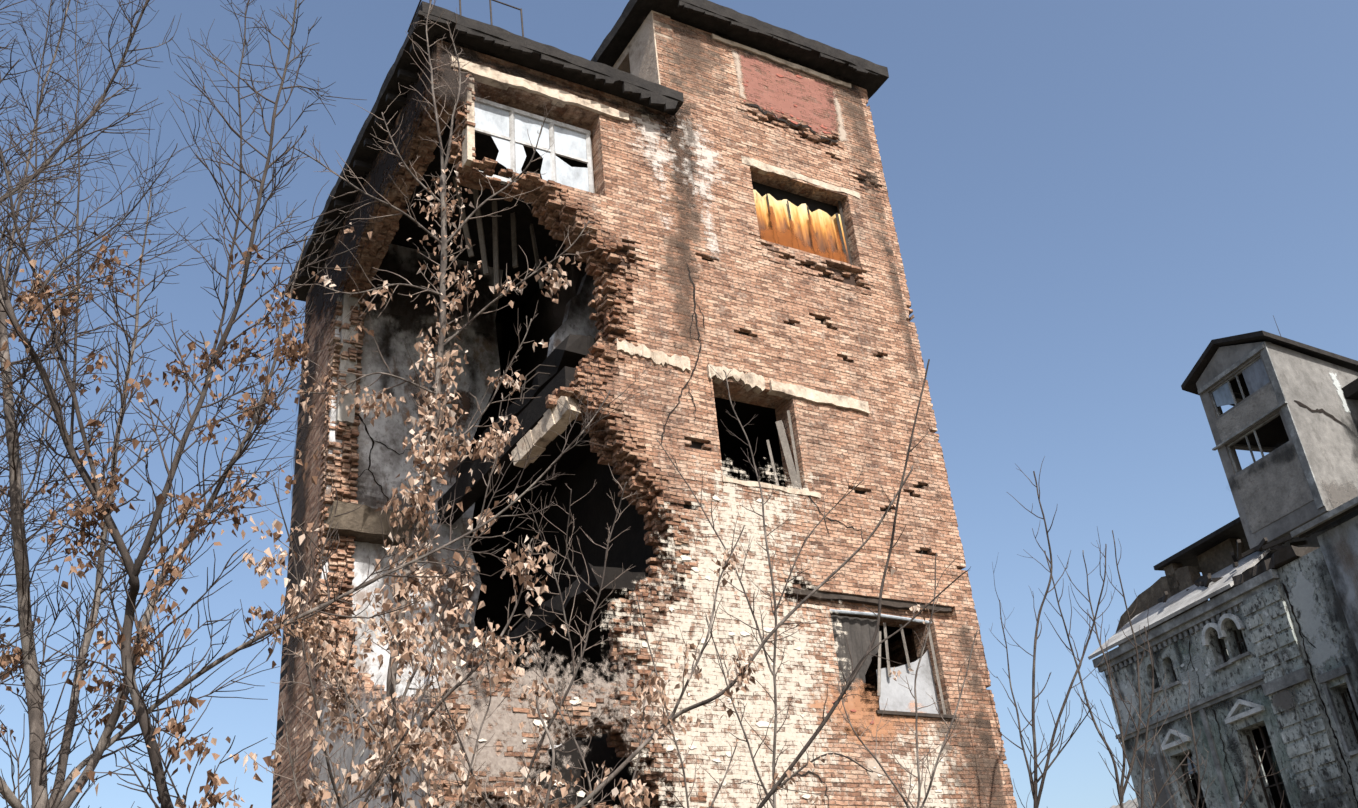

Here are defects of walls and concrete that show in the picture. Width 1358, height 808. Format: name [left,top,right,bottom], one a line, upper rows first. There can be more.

spalling [482,157,498,169]
spalling [525,171,578,206]
water stain [633,103,728,346]
spalling [601,250,639,294]
spalling [782,256,859,287]
spalling [588,324,627,361]
spalling [557,386,575,397]
crack [1294,400,1348,428]
peeling [310,440,966,808]
water stain [1322,544,1358,680]
water stain [1103,613,1245,700]
water stain [1124,685,1265,808]